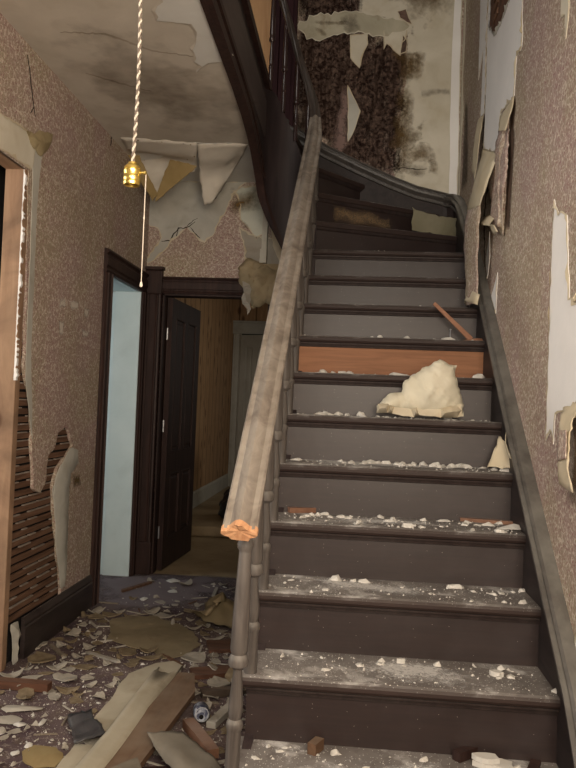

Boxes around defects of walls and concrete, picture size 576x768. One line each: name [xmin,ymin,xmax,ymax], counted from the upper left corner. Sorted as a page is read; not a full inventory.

water stain [299,0,361,21]
crack [27,55,36,117]
water stain [298,23,426,174]
flaking render [472,0,523,179]
crack [162,218,200,242]
flaking render [147,142,282,264]
peeling [479,214,498,314]
flaking render [545,199,576,444]
flaking render [0,112,79,665]